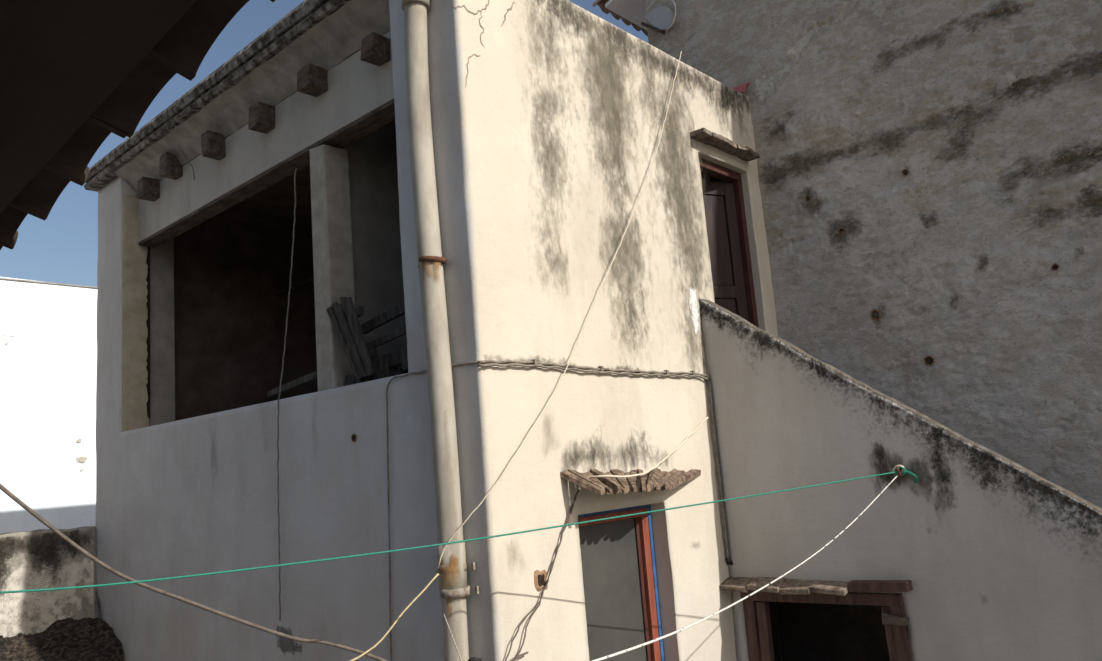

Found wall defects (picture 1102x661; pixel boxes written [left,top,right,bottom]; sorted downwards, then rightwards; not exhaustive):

crack [452,0,515,84]
damp [538,0,749,167]
damp [546,144,556,181]
damp [647,78,702,284]
damp [611,225,639,282]
mould [700,303,1102,531]
mould [565,445,610,467]
mould [622,444,638,465]
damp [0,542,10,595]